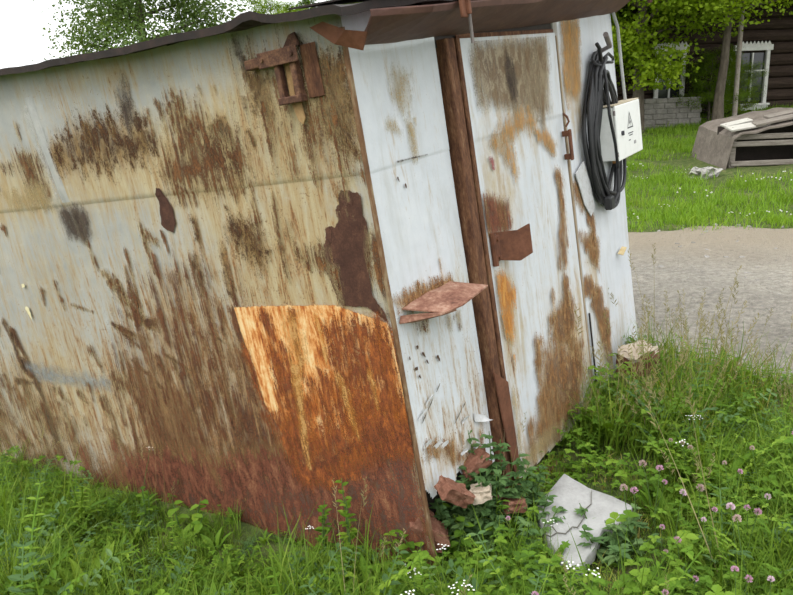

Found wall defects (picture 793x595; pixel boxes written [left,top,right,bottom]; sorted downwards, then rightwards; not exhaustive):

rust [0,35,454,570]
rust [426,429,484,466]
rust [471,36,613,469]